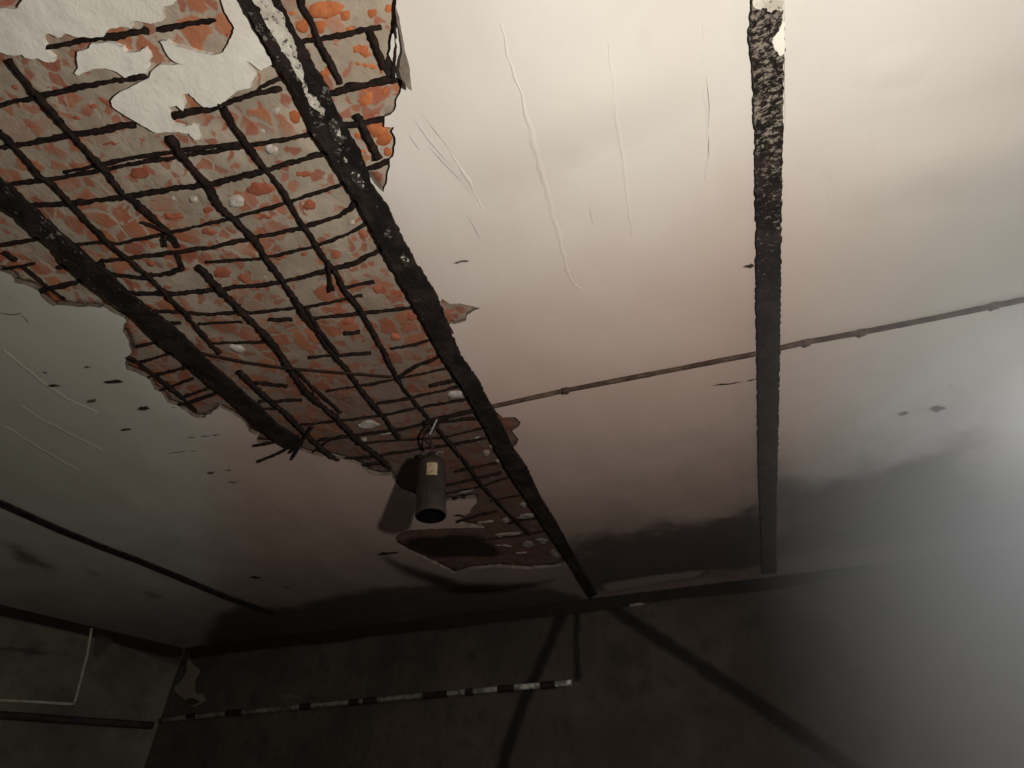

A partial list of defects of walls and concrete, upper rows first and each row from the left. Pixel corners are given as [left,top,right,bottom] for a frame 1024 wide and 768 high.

spalling [0,0,567,571]
crack [410,114,455,175]